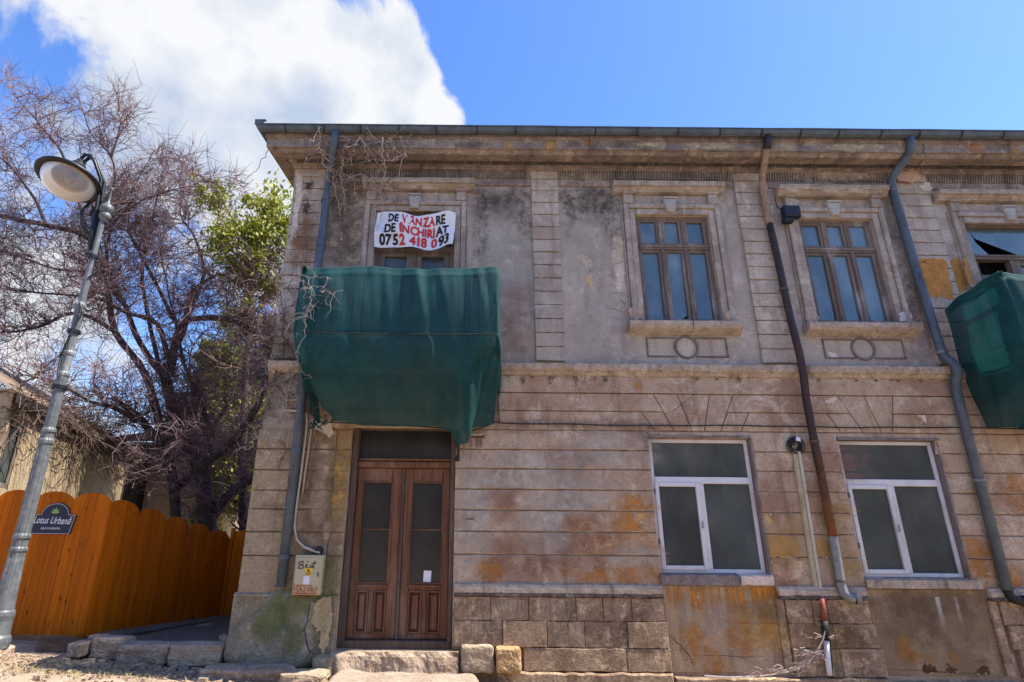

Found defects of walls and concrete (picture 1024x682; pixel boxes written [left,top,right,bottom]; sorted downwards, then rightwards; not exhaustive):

flaking render [918,257,979,300]
spalling [310,596,333,654]
rust [668,587,781,647]